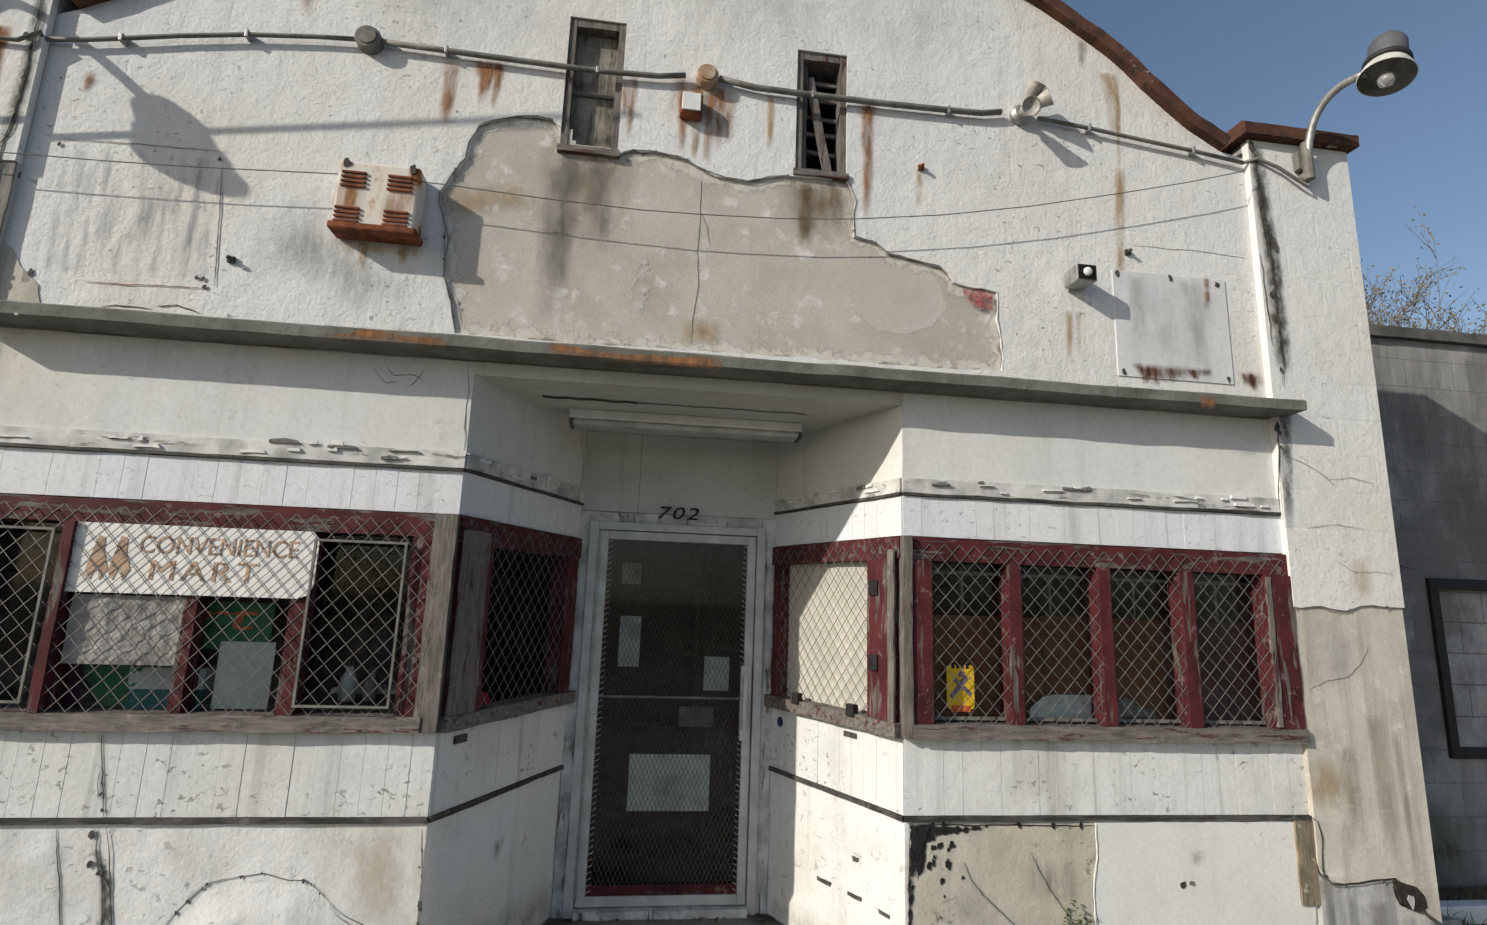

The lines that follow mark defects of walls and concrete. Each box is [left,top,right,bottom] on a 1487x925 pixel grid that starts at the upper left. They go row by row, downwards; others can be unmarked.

rust [443,77,452,113]
rust [477,64,501,95]
rust [862,106,871,198]
spalling [441,117,1002,371]
crack [1135,140,1285,373]
water stain [1253,154,1286,353]
rust [1138,366,1209,381]
peeling [239,438,358,453]
crack [1274,416,1370,520]
crack [56,735,112,925]
crack [165,872,362,925]
spalling [908,821,1095,925]